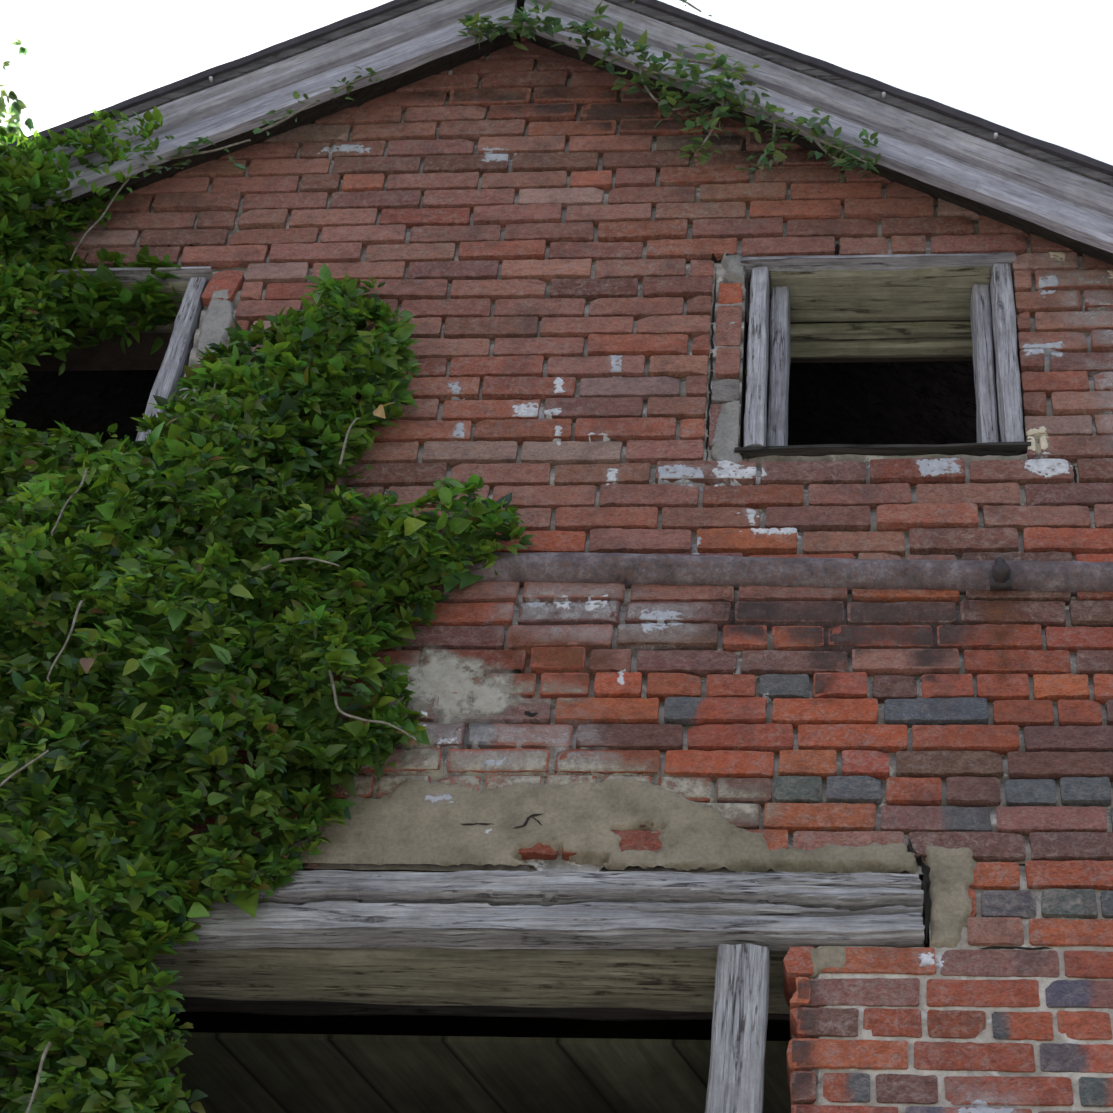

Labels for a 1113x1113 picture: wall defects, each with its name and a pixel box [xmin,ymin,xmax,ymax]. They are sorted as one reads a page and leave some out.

peeling [419,794,454,803]